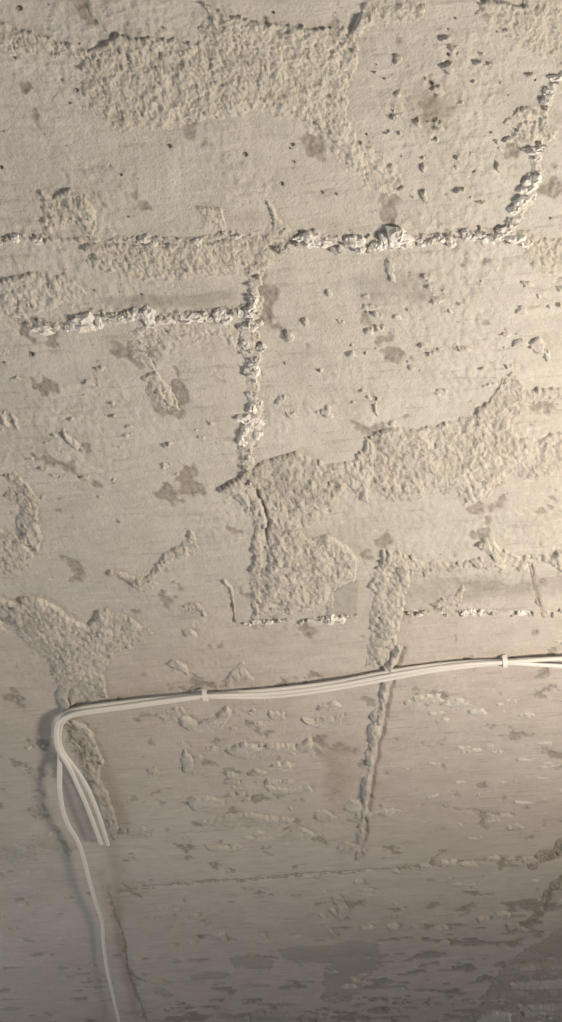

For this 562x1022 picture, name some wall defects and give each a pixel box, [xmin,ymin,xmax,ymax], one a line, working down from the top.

peeling [404,689,517,729]
crack [108,837,562,1021]
peeling [278,940,383,1003]